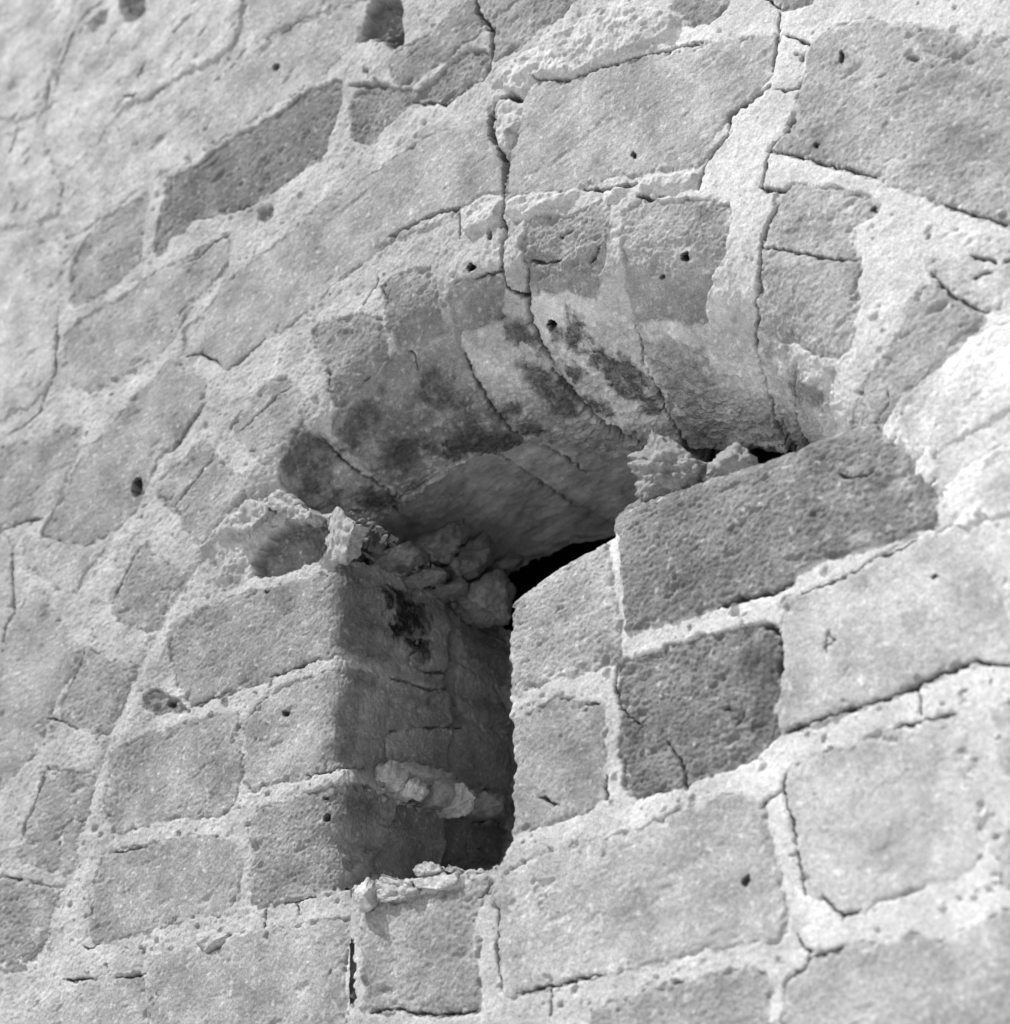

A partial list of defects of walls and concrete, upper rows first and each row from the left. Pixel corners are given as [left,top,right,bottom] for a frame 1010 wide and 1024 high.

spalling [358,0,406,51]
crack [414,3,704,447]
crack [697,0,878,452]
crack [944,202,1008,227]
damp [504,322,539,346]
damp [523,315,662,418]
damp [281,390,383,494]
damp [384,425,546,467]
damp [363,485,397,508]
damp [381,584,433,661]